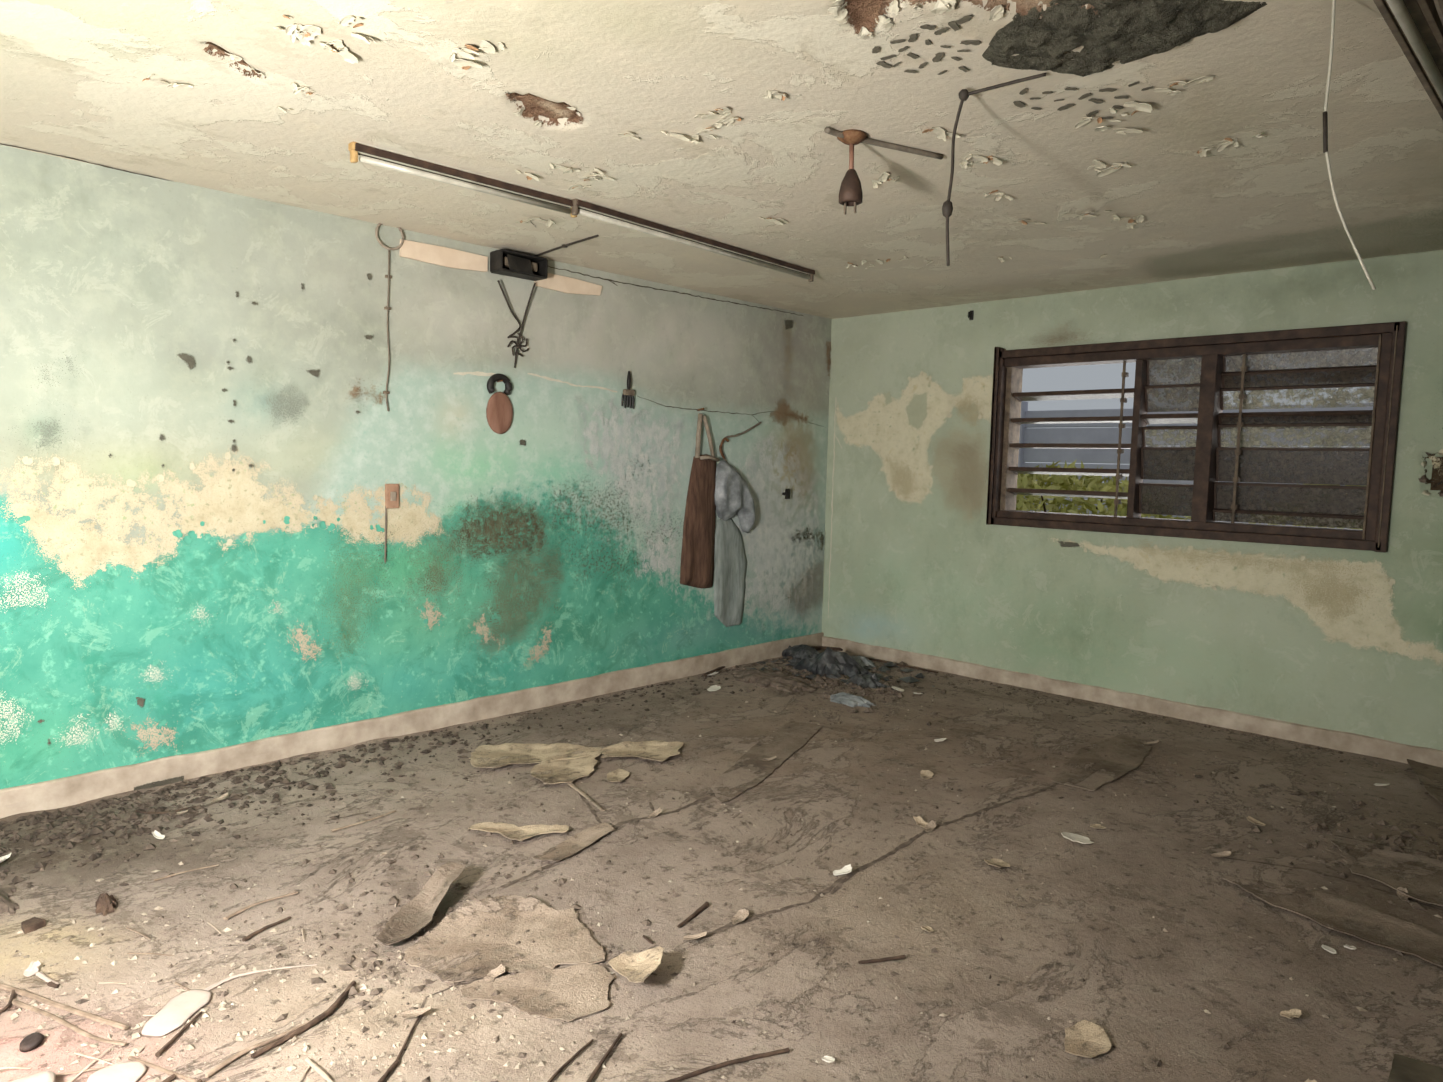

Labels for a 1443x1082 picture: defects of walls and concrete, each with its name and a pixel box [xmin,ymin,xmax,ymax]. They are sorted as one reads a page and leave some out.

spalling [828,0,1058,40]
spalling [504,92,583,128]
peeling [0,385,447,616]
leakage [308,394,693,663]
peeling [835,371,993,506]
peeling [1048,537,1443,667]